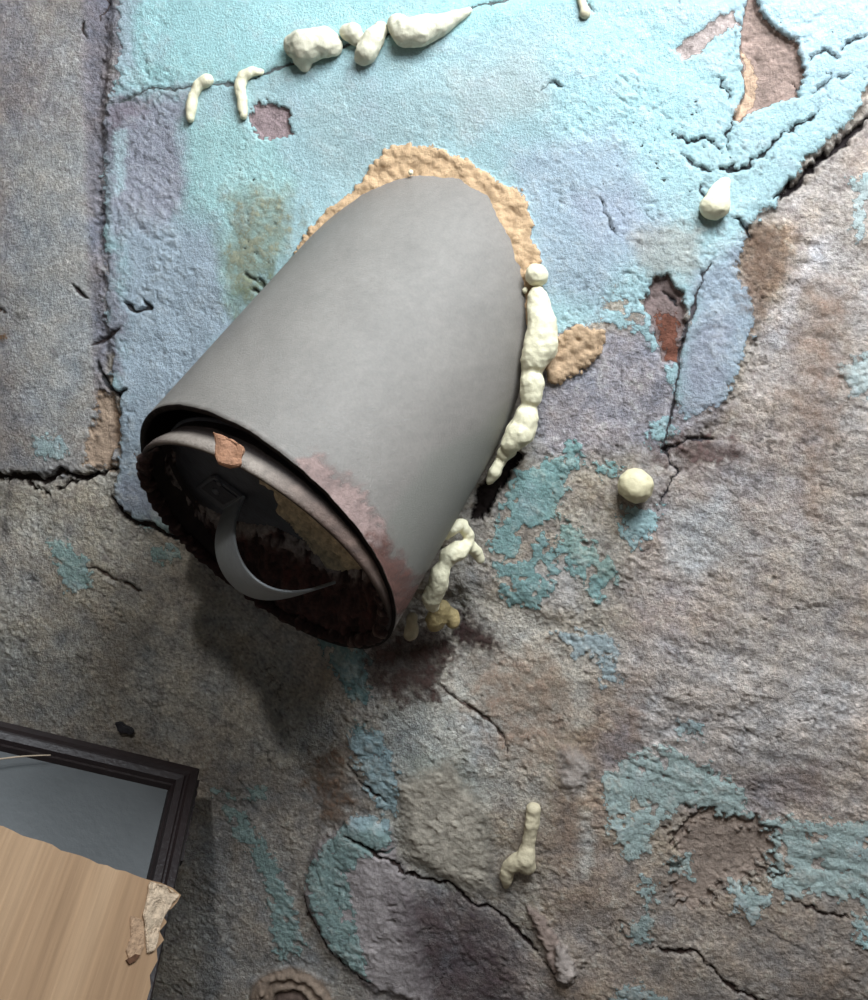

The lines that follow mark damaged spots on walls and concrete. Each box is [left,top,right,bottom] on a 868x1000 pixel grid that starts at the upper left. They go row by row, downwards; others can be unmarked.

crack [106,62,294,106]
peeling [82,0,868,540]
crack [657,263,712,511]
peeling [31,431,70,461]
crack [0,467,179,540]
rust [296,454,419,615]
peeling [615,504,667,553]
peeling [549,627,625,690]
crack [444,687,509,753]
peeling [601,717,868,950]
crack [345,836,556,975]
crack [645,946,763,1000]